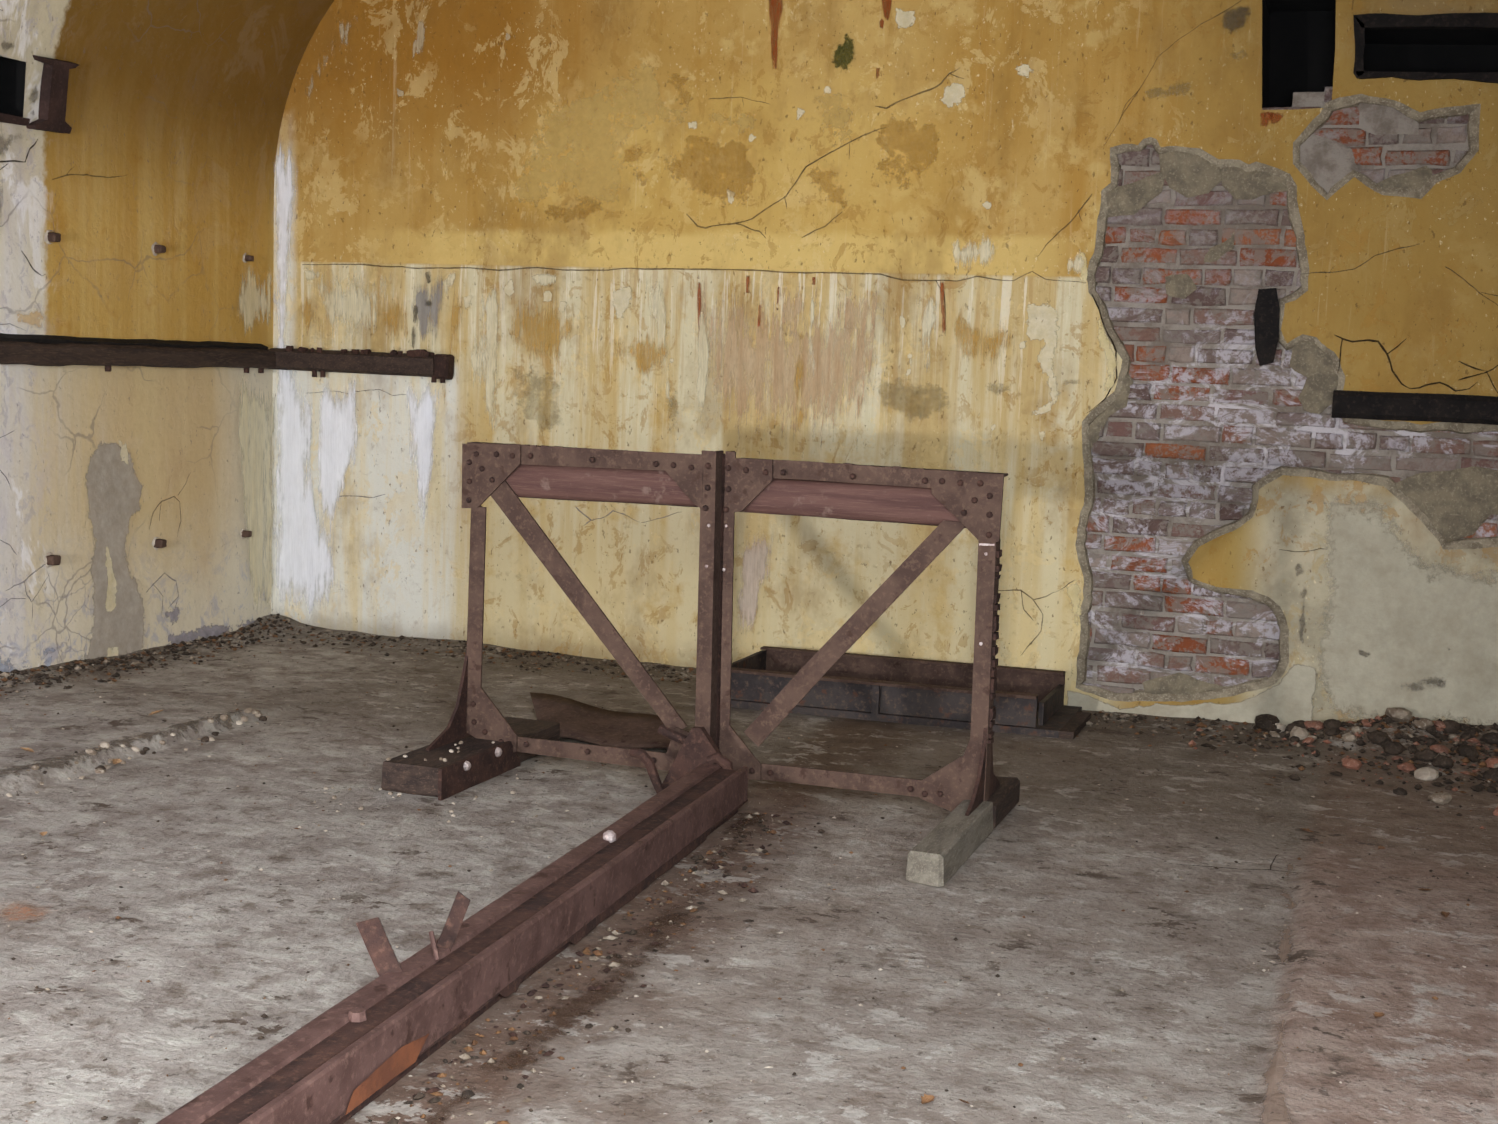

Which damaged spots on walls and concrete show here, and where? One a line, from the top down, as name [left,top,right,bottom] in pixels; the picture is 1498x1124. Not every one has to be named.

rust [769,0,782,69]
rust [880,0,892,29]
water stain [533,274,556,285]
crack [302,68,1117,413]
water stain [471,291,497,423]
water stain [619,286,666,373]
water stain [697,289,877,431]
crack [1335,335,1498,393]
flaking render [1067,86,1498,726]
crack [149,472,191,537]
crack [0,540,46,618]
crack [146,573,179,610]